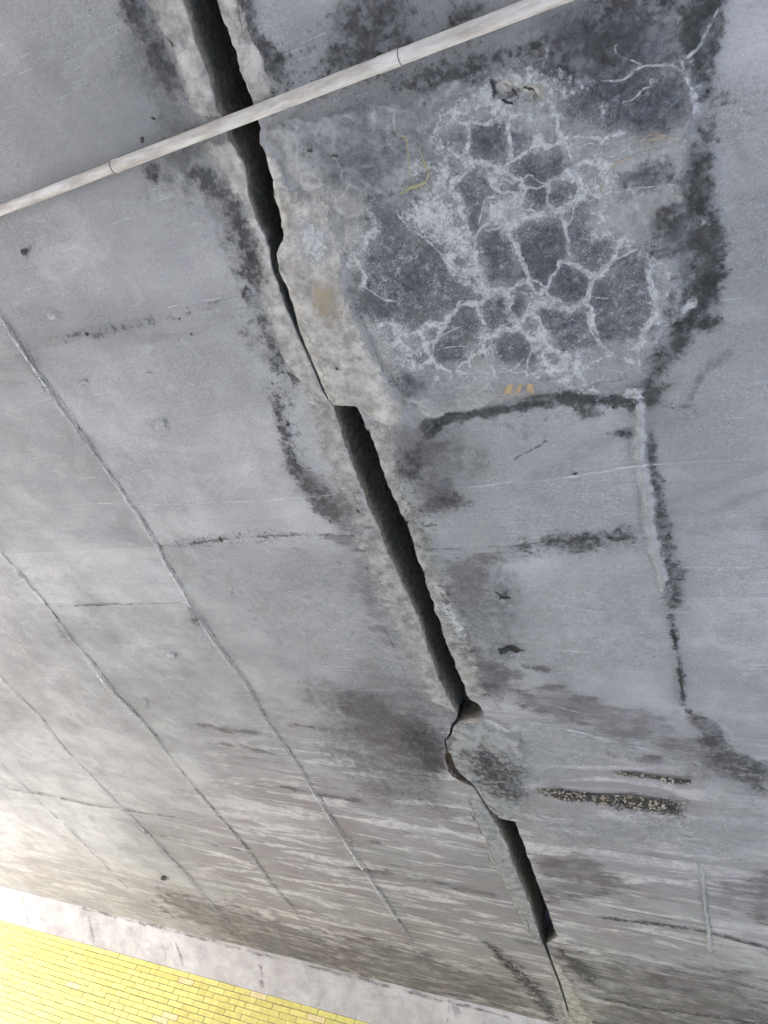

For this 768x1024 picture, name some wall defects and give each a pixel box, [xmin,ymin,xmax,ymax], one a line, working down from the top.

water stain [237,0,424,97]
water stain [145,164,159,183]
water stain [186,167,268,301]
water stain [307,0,729,557]
crack [274,269,333,405]
water stain [248,317,352,543]
crack [444,699,475,749]
crack [464,778,488,808]
spalling [534,772,697,819]